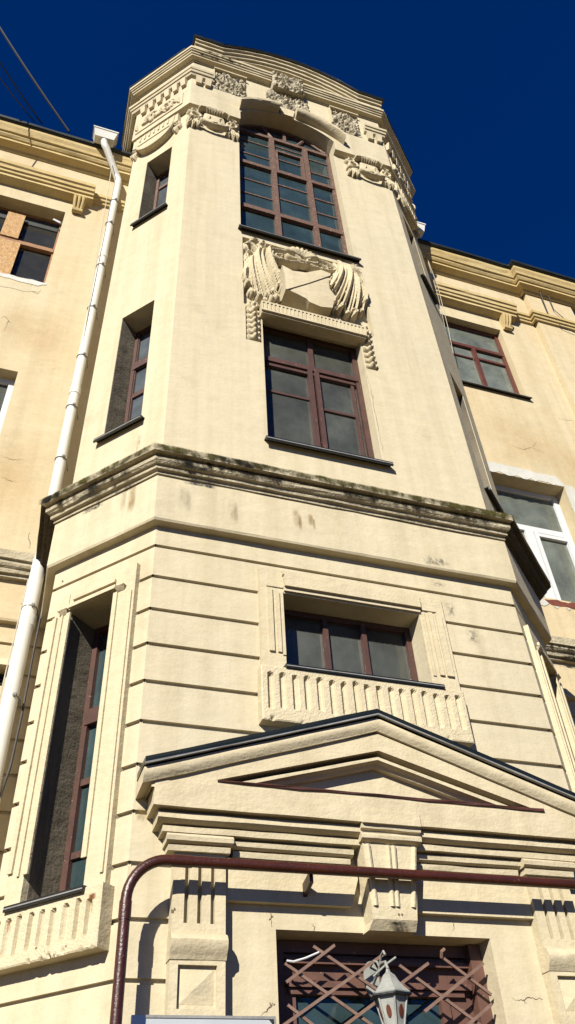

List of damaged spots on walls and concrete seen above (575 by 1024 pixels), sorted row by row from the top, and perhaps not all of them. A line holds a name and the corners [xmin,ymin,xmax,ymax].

damp [175,457,283,482]
damp [41,470,127,506]